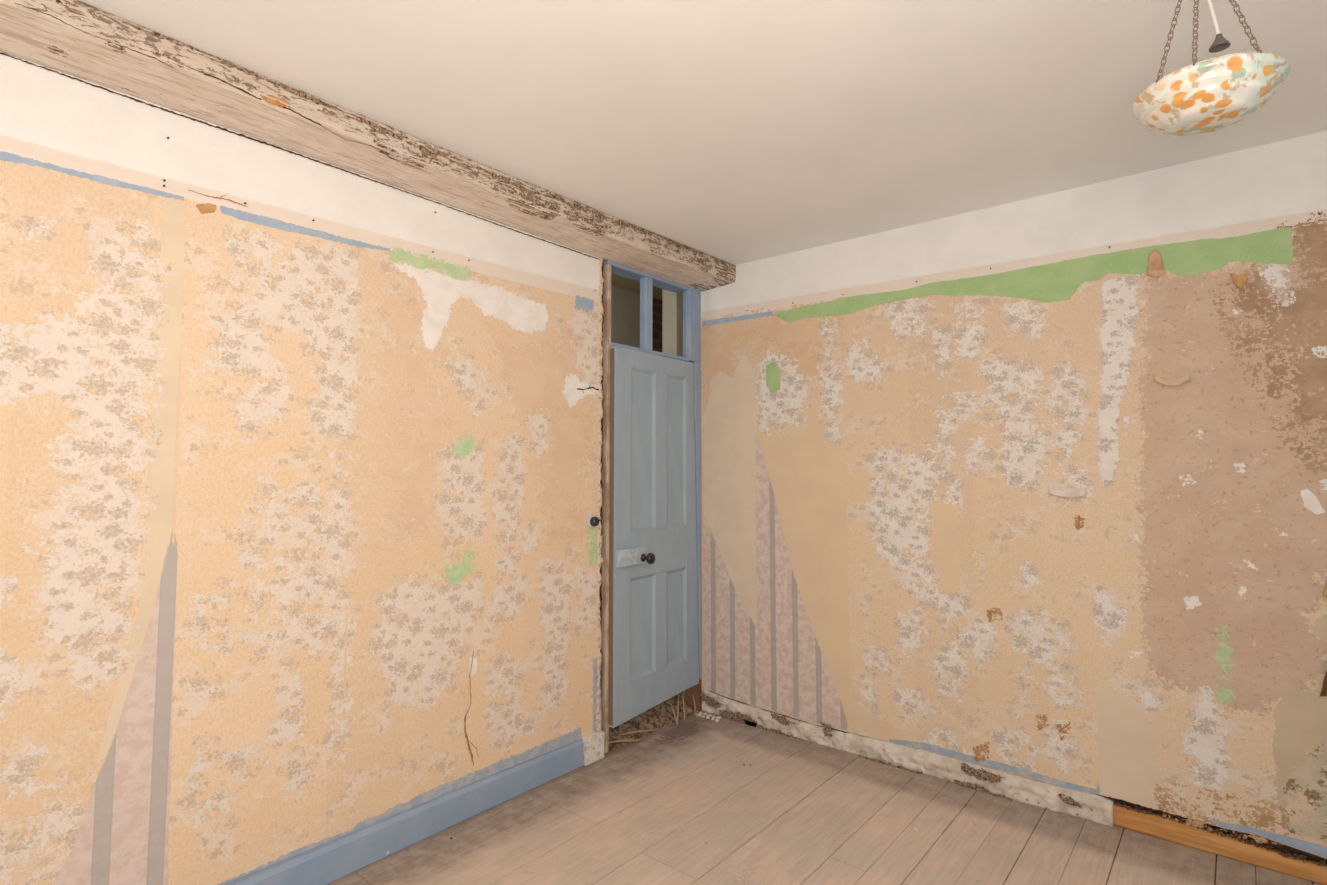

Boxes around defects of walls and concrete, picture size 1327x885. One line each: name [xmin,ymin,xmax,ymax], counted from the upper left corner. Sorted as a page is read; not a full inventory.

peeling [55,0,736,291]
flaking render [394,261,549,459]
peeling [469,257,604,747]
peeling [881,297,1099,510]
peeling [1301,478,1327,514]
peeling [1311,345,1327,359]
peeling [0,739,88,885]
peeling [181,590,237,703]
peeling [178,610,383,840]
crack [464,651,479,766]
flaking render [700,585,1115,827]
peeling [1183,596,1202,610]